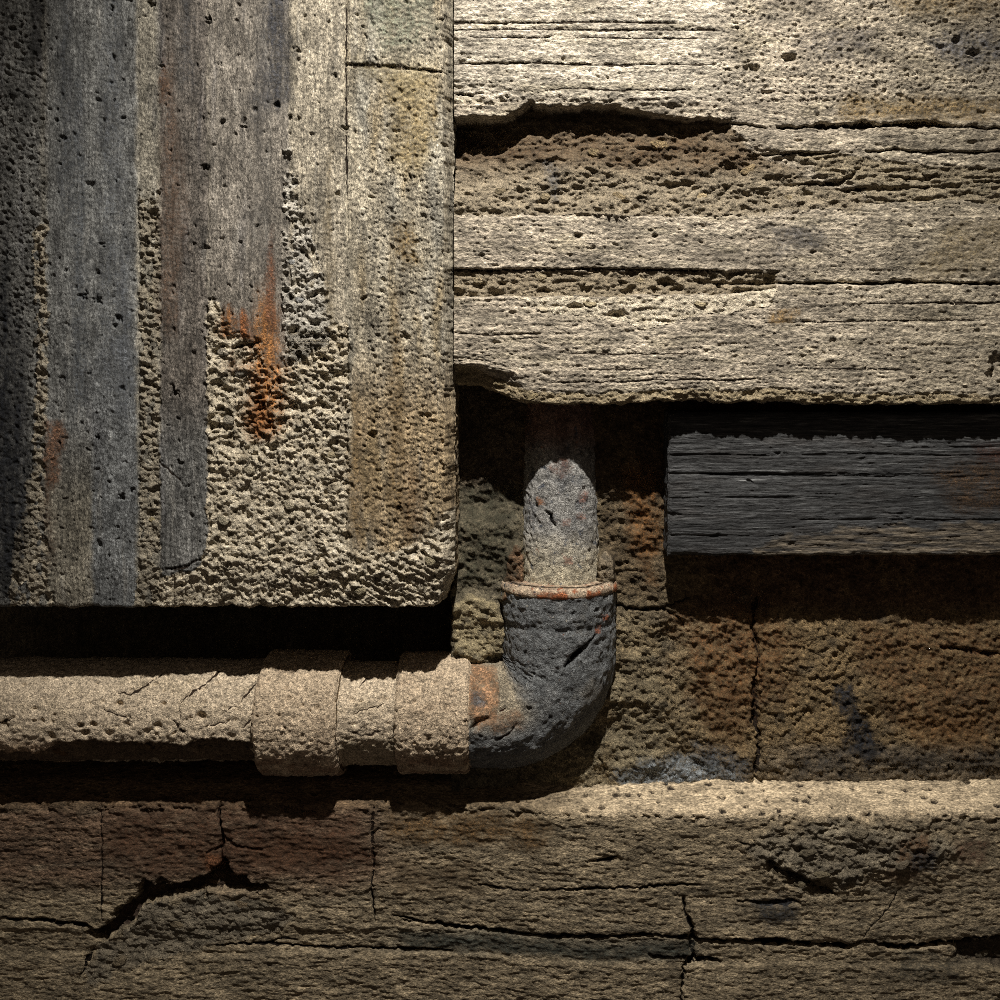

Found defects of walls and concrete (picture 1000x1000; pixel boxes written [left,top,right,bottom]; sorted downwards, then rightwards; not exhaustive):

corrosion [221,246,284,437]
crack [750,597,764,775]
crack [3,812,103,977]
crack [210,805,991,1000]